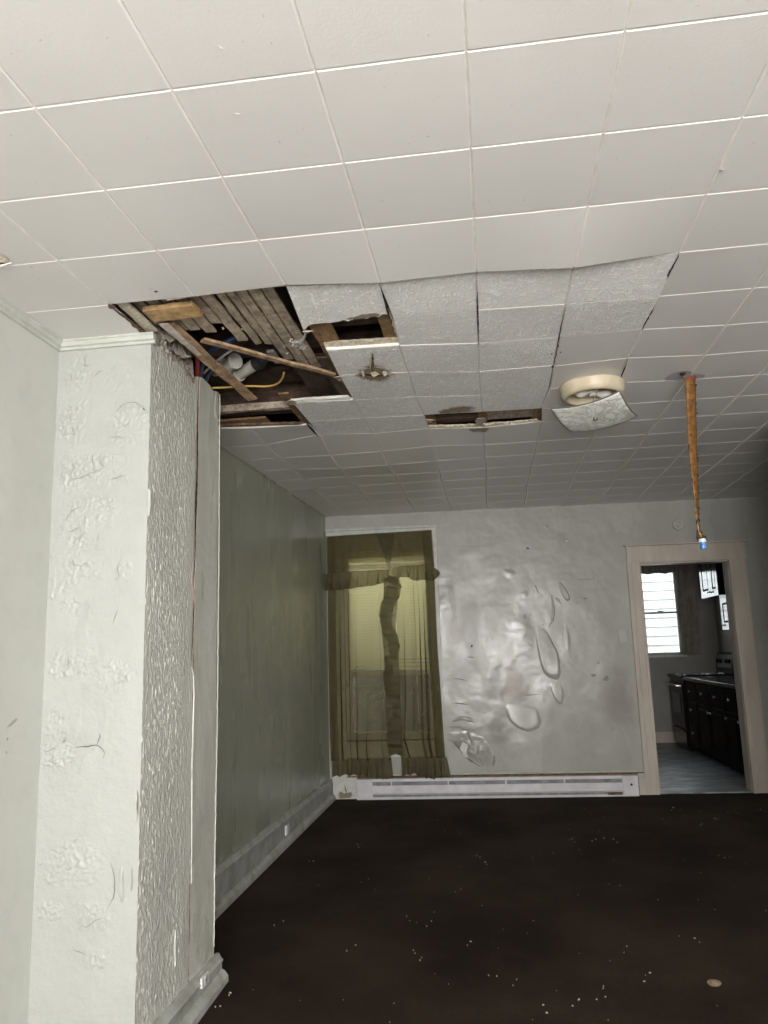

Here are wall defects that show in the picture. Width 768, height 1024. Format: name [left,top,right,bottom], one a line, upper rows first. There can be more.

flaking render [144,301,194,382]
peeling [105,390,149,449]